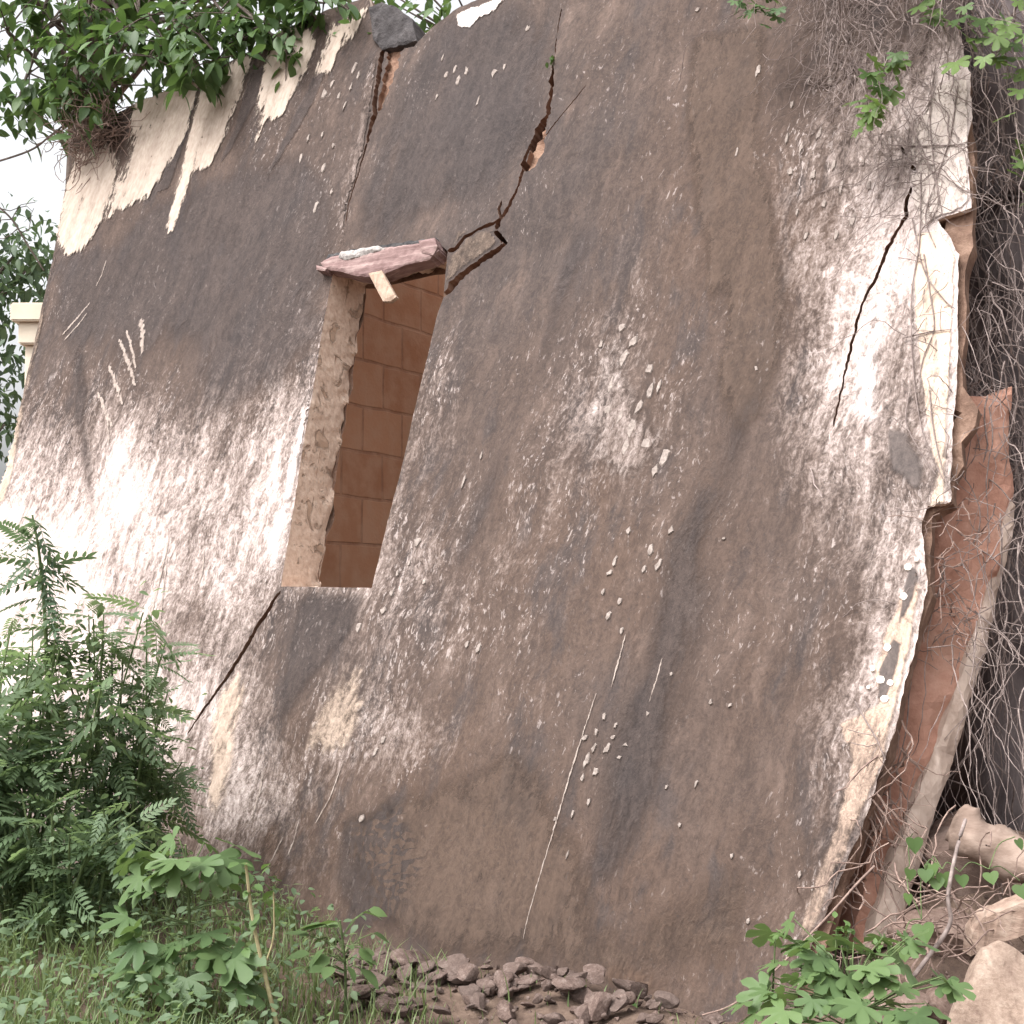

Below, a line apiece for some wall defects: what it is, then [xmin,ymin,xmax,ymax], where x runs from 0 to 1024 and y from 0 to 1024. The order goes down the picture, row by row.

peeling [52,55,252,267]
peeling [255,7,376,228]
crack [346,50,401,220]
peeling [457,0,501,27]
crack [444,9,586,295]
spalling [0,407,22,501]
peeling [268,396,310,567]
peeling [855,295,885,422]
crack [833,147,916,426]
peeling [910,79,968,507]
crack [187,591,281,734]
spalling [801,568,919,935]